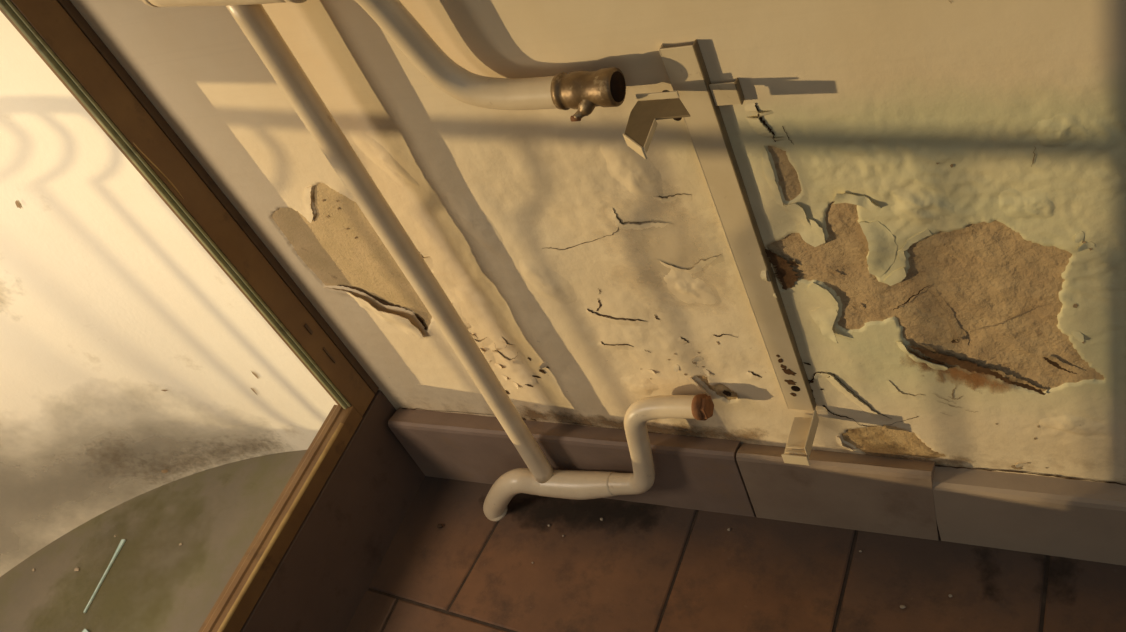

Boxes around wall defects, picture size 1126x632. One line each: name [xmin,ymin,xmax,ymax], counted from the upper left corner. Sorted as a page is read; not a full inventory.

crack [548,194,693,250]
peeling [272,183,432,339]
peeling [760,146,1104,395]
peeling [452,303,550,394]
crack [586,289,734,353]
crack [809,372,982,427]
spalling [836,425,945,459]
damp [508,499,653,528]